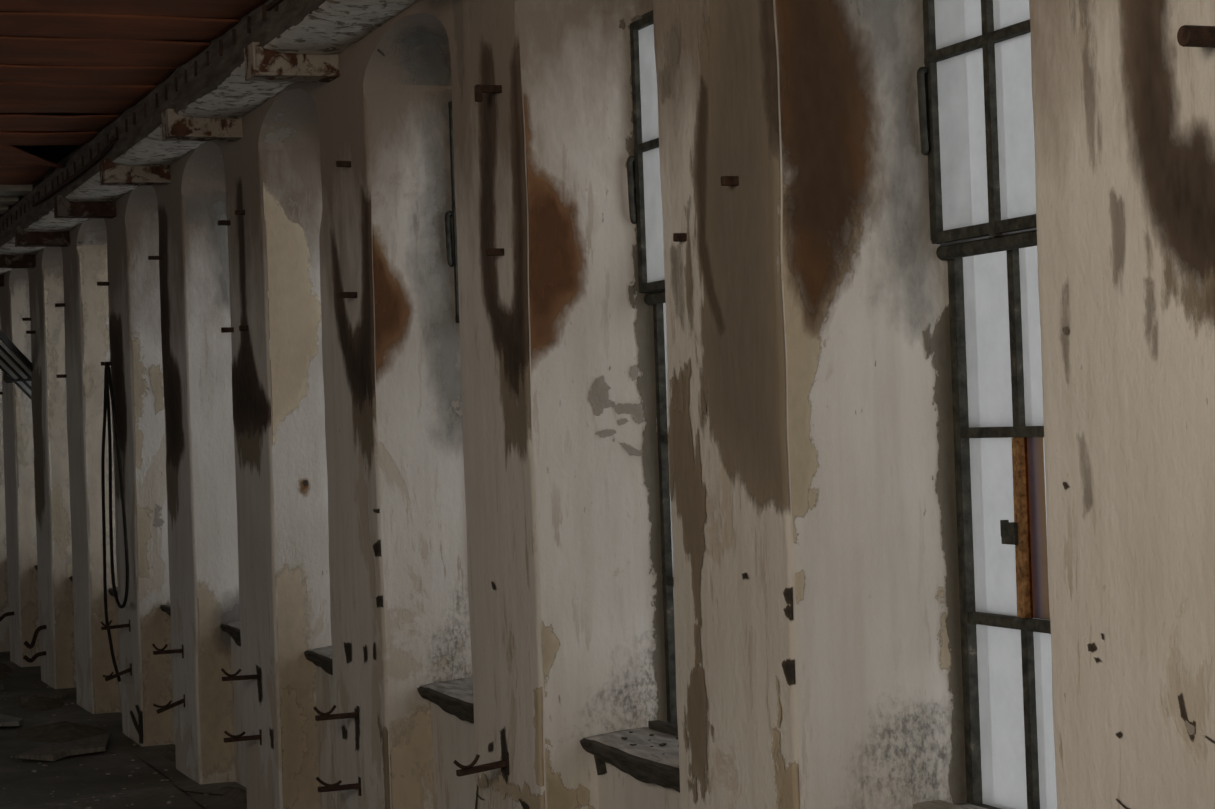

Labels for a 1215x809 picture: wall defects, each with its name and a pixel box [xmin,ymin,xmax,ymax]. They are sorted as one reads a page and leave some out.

water stain [190,181,271,475]
peeling [263,182,321,445]
water stain [331,193,376,470]
water stain [479,43,532,459]
peeling [588,53,714,803]
water stain [670,0,790,513]
water stain [853,0,923,258]
water stain [1079,0,1099,137]
water stain [1110,193,1125,281]
water stain [1121,0,1215,355]
peeling [477,623,595,809]
water stain [873,708,946,798]